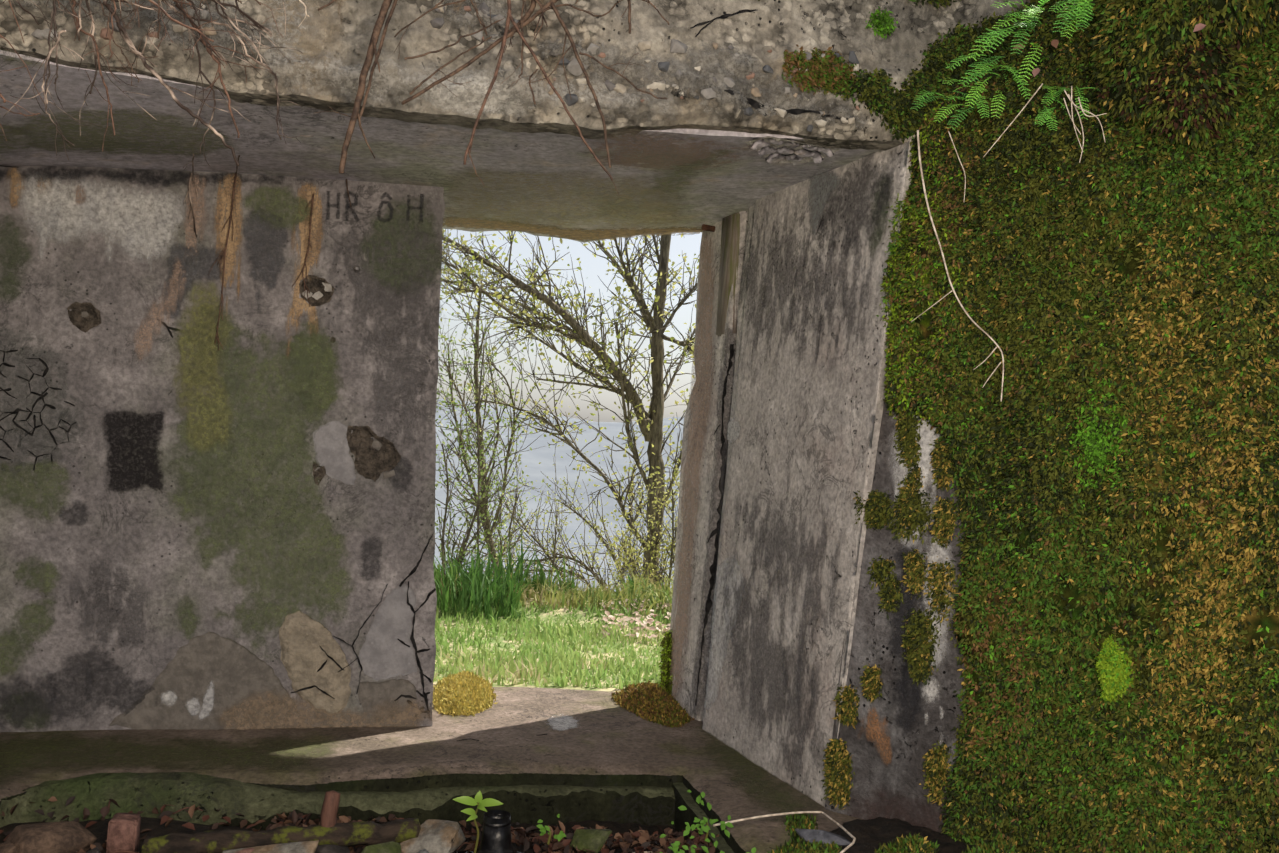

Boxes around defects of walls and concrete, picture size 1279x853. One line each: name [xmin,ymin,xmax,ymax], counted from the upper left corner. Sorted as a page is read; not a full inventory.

rust [186,174,242,305]
rust [287,184,323,357]
spalling [299,275,334,306]
damp [818,153,893,250]
crack [0,350,76,470]
spalling [313,421,401,486]
crack [695,344,734,706]
crack [334,534,436,718]